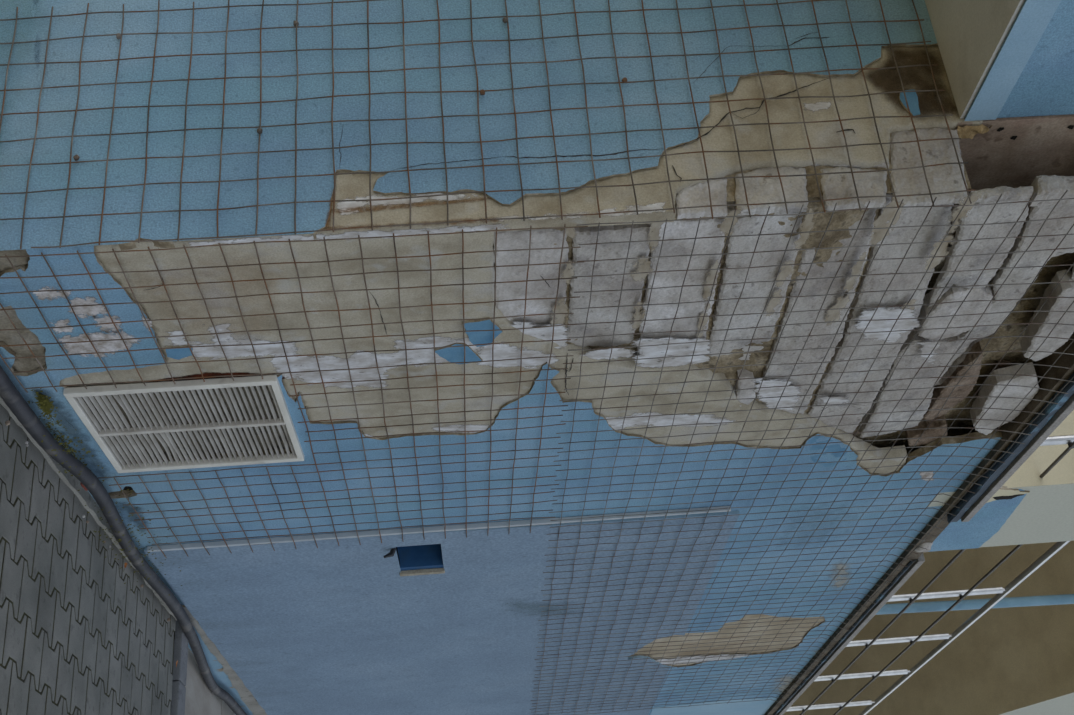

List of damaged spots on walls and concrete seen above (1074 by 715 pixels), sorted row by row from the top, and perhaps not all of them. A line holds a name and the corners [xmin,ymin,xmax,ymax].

crack [695,32,829,81]
water stain [868,49,956,115]
crack [391,78,829,182]
rust [326,199,483,229]
spalling [0,249,29,273]
flaking render [60,45,1074,474]
spalling [0,305,46,373]
spalling [30,286,140,357]
rust [145,373,264,383]
flaking render [633,614,825,666]